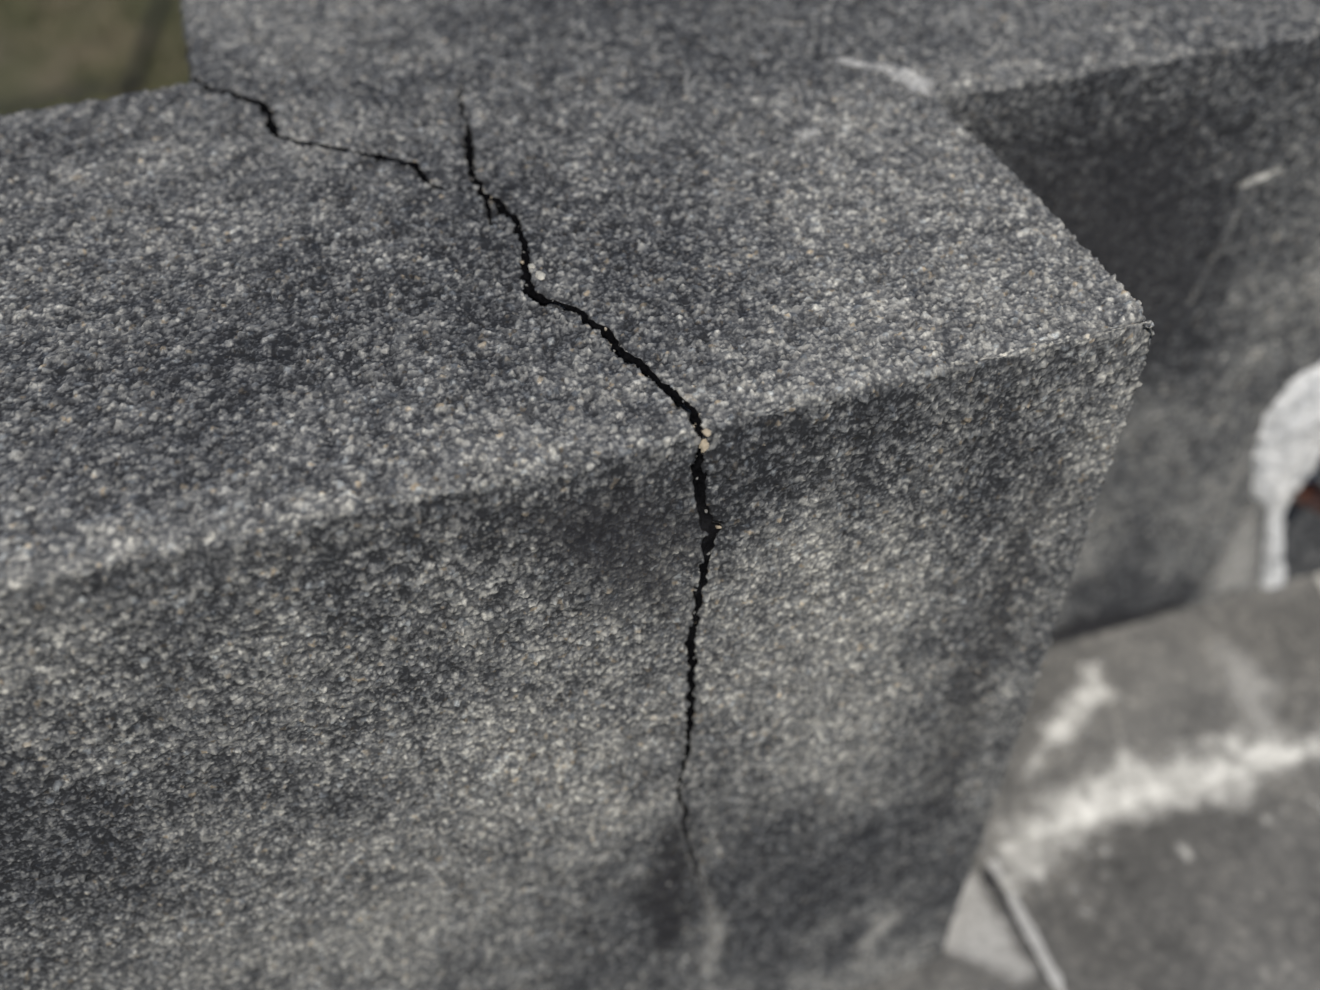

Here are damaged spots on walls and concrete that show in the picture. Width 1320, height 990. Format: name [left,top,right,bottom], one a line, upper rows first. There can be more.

crack [191,77,722,935]
leakage [982,654,1320,951]